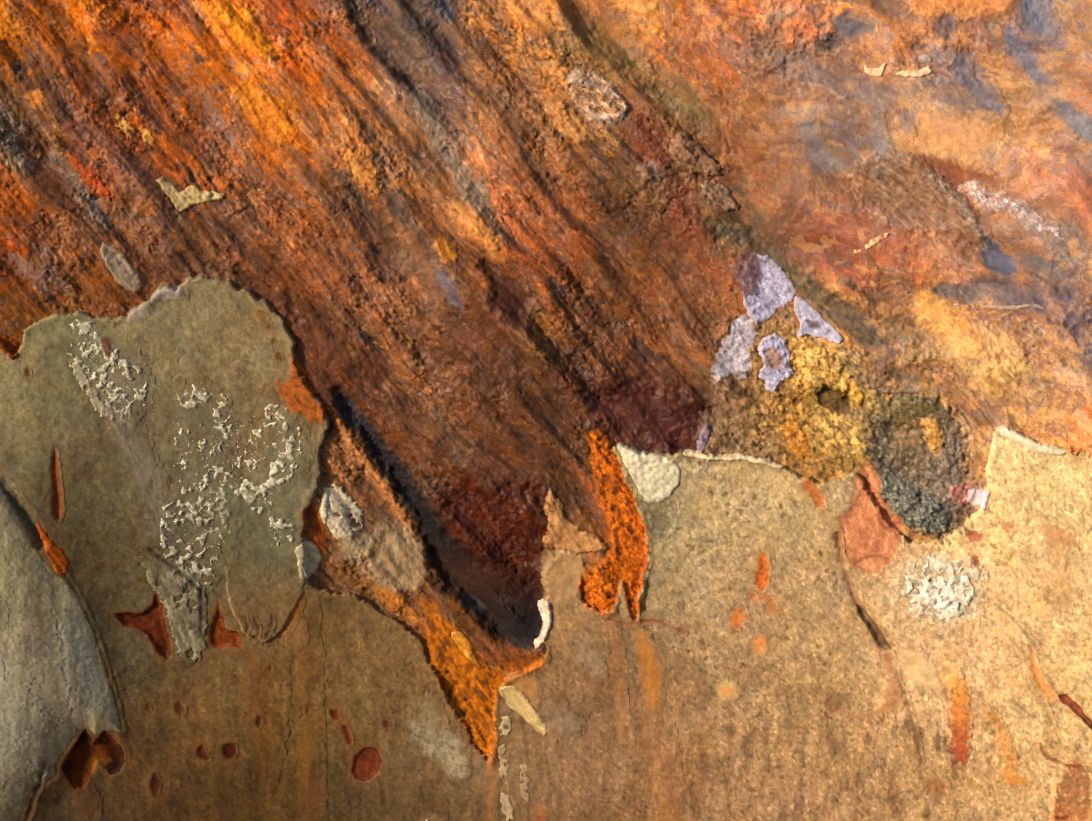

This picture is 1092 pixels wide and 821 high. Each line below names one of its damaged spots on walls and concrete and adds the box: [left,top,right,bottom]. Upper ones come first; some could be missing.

peeling [156,176,225,212]
corrosion [0,0,1092,575]
peeling [709,247,844,392]
peeling [67,242,431,663]
peeling [617,423,784,546]
leakage [692,314,995,637]
corrosion [309,504,551,821]
peeling [533,488,606,649]
corrosion [727,549,783,659]
corrosion [939,663,1029,787]
crack [993,602,1092,772]
corrosion [1047,764,1092,821]